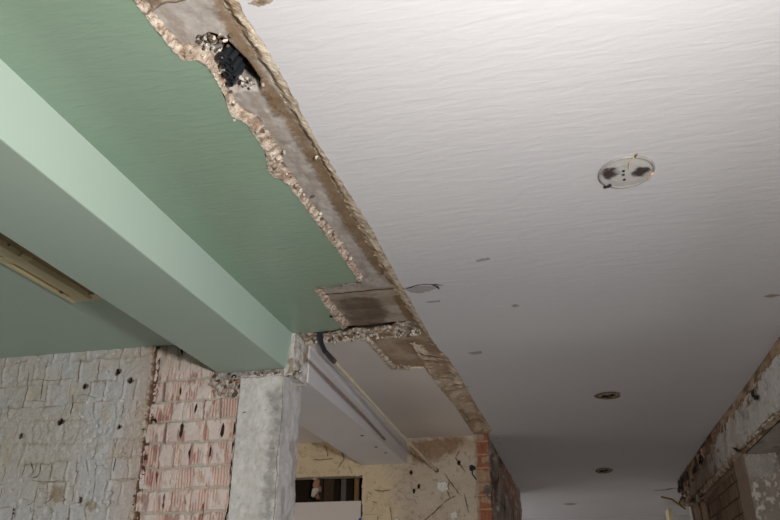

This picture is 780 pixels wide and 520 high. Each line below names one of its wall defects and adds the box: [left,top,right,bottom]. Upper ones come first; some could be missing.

flaking render [133,0,500,446]
crack [7,360,100,421]
crack [0,439,134,520]
flaking render [677,337,780,494]